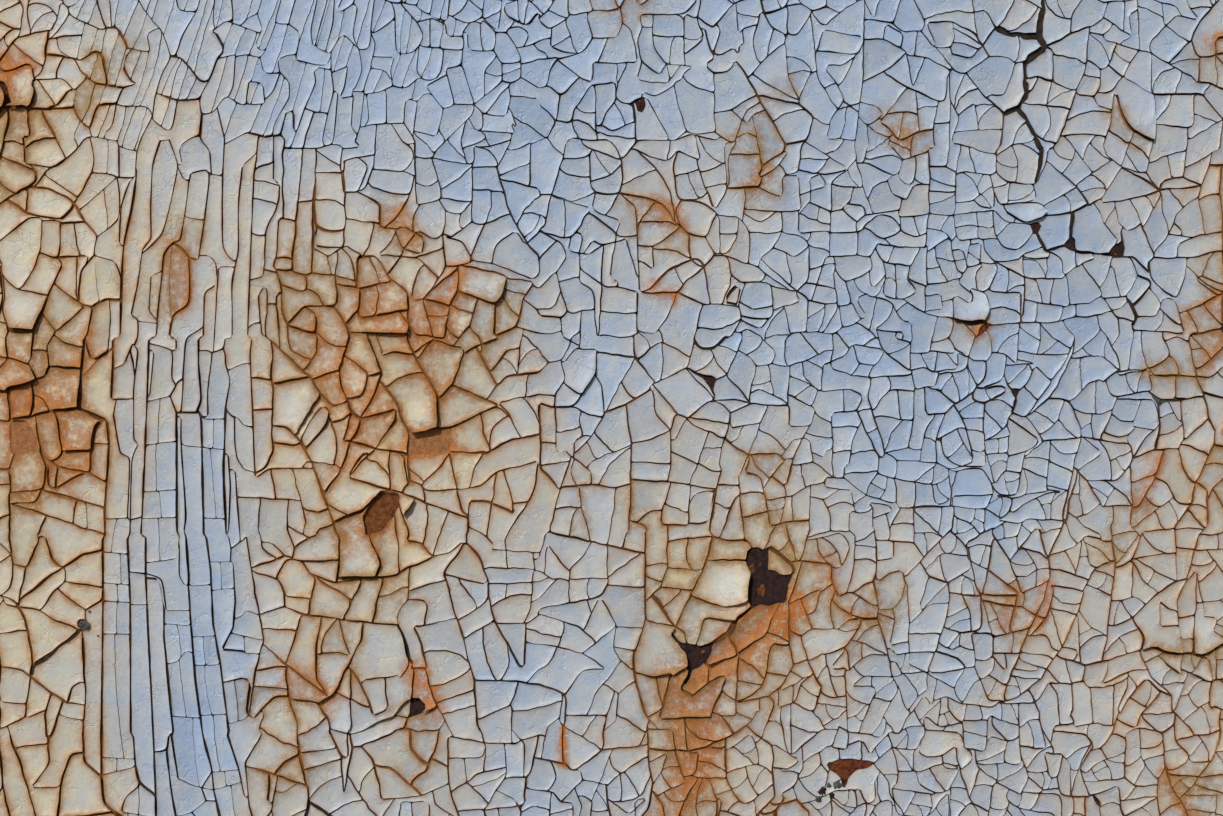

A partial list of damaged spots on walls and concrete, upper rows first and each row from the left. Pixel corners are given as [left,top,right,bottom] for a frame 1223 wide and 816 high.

rust [0,54,38,152]
rust [0,314,100,532]
peeling [325,443,414,576]
rust [274,254,516,474]
crack [941,258,1184,348]
crack [1029,403,1223,538]
crack [1102,156,1223,329]
peeling [634,538,792,718]
rust [646,544,897,816]
crack [681,505,901,728]
peeling [777,757,875,816]
crack [964,643,1223,816]